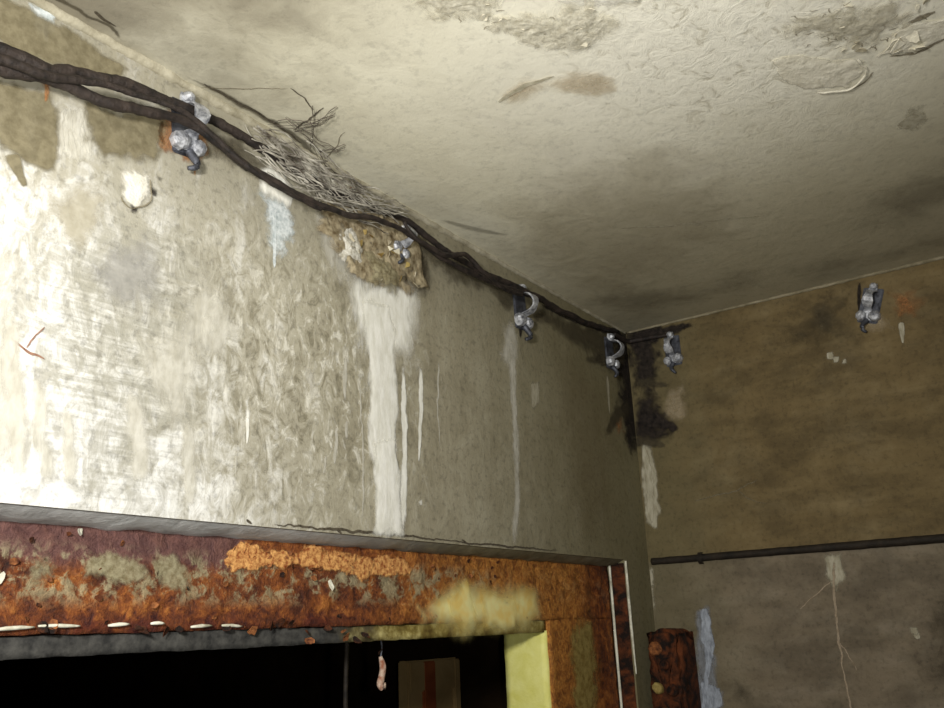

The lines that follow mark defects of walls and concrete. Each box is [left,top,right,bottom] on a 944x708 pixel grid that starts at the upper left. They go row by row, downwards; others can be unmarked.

peeling [418,0,616,50]
spalling [773,0,944,94]
damp [309,162,513,535]
damp [535,306,691,528]
corrosion [224,541,412,582]
corrosion [25,616,58,634]
corrosion [212,616,258,635]
damp [700,609,715,708]
crack [800,554,857,708]